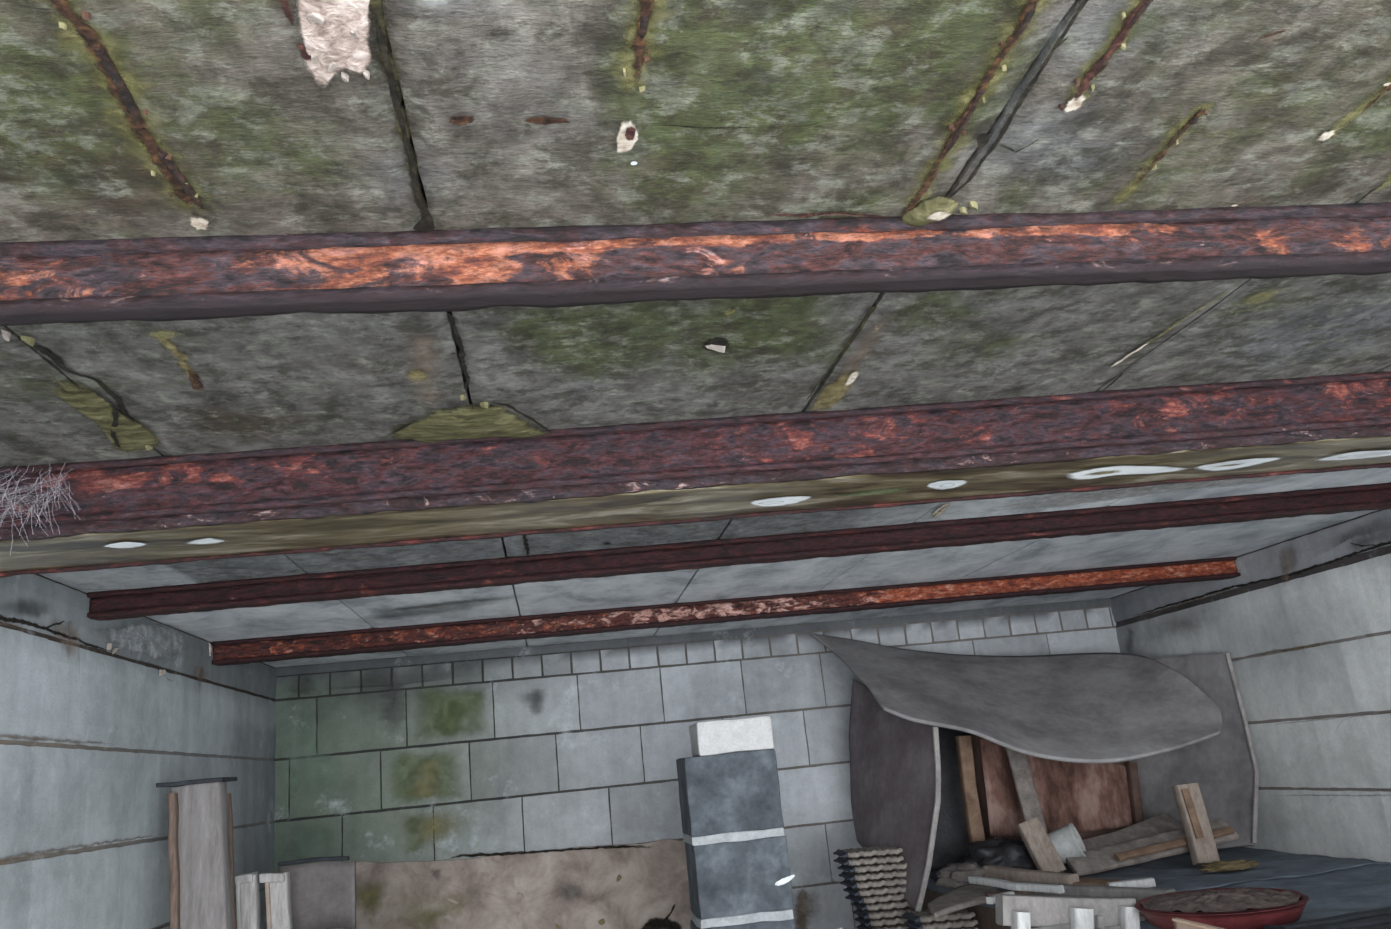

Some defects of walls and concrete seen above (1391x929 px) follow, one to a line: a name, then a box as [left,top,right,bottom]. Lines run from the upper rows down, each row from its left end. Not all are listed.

spalling [280,0,371,84]
crack [368,0,435,232]
crack [948,0,1089,199]
corrosion [151,331,203,390]